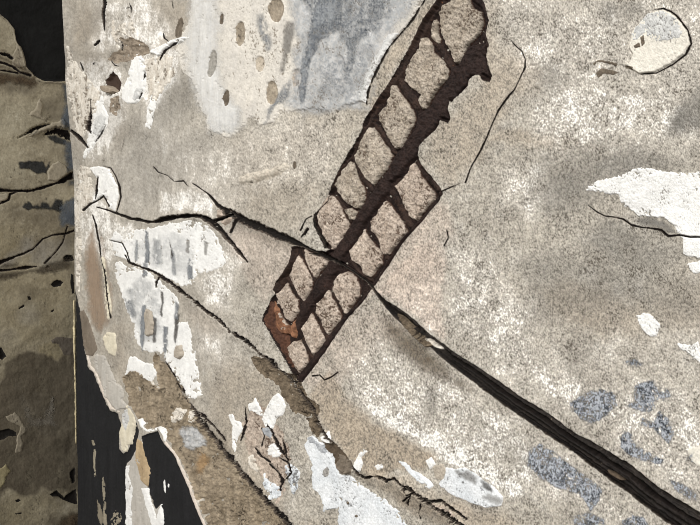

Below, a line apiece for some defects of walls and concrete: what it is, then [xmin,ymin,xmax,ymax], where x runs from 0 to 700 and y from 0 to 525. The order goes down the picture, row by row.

water stain [268,0,413,113]
peeling [593,10,690,78]
crack [441,40,526,192]
crack [0,172,74,204]
crack [0,226,75,272]
spalling [0,0,503,525]
peeling [586,167,700,274]
crack [588,205,700,238]
crack [82,166,375,444]
rust [264,301,298,367]
crack [352,466,468,525]